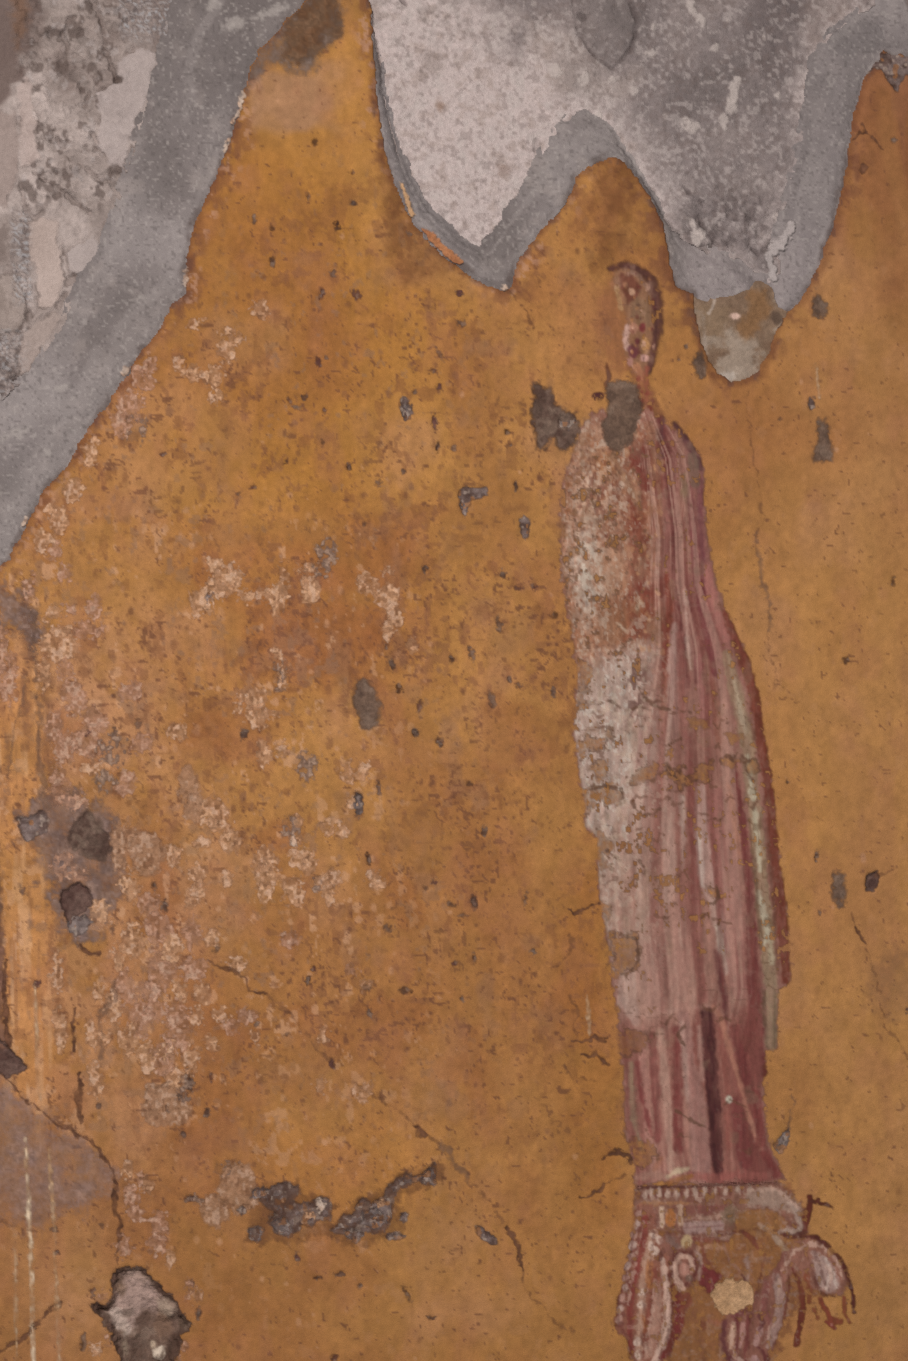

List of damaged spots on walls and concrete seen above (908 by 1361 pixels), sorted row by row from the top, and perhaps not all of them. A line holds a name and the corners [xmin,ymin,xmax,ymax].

flaking render [369,0,908,382]
spalling [530,383,580,450]
spalling [602,380,643,450]
spalling [808,368,833,461]
peeling [189,537,338,618]
peeling [356,566,404,693]
spalling [352,678,382,730]
peeling [33,594,260,1137]
peeling [252,813,343,907]
spalling [865,870,879,892]
spalling [0,1040,27,1078]
spalling [185,1160,437,1243]